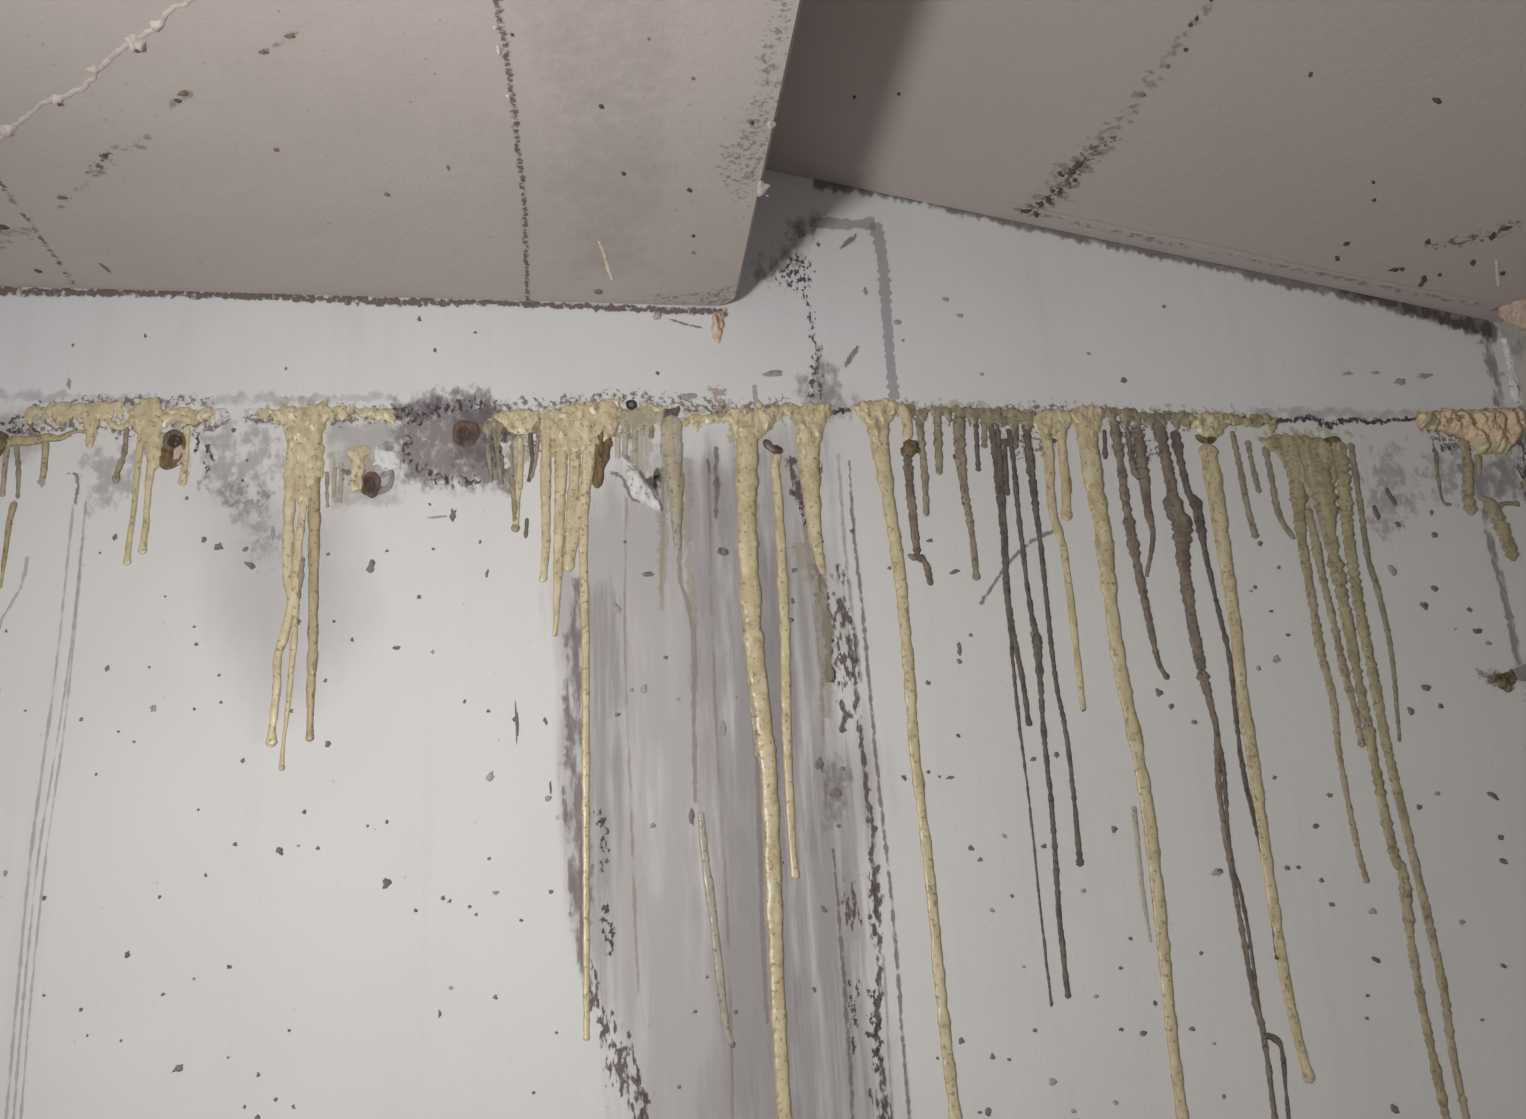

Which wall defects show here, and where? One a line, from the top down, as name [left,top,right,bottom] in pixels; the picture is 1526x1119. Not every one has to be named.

water stain [0,414,155,589]
water stain [175,409,202,486]
water stain [265,438,359,771]
water stain [387,389,685,1119]
water stain [698,811,734,1045]
water stain [714,420,890,1119]
water stain [866,402,1470,1119]
water stain [1432,437,1526,562]